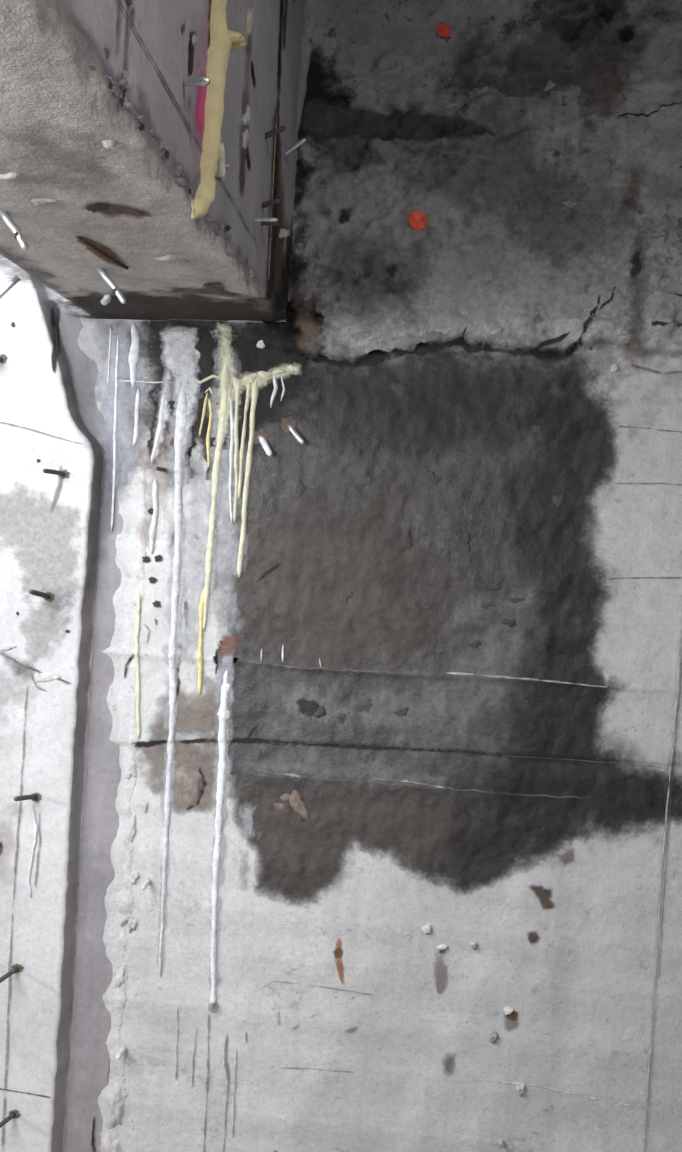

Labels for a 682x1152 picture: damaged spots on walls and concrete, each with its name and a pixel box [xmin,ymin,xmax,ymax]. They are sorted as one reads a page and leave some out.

water stain [215,6,256,194]
crack [618,102,682,118]
water stain [0,249,64,293]
crack [313,287,615,367]
crack [652,293,682,328]
crack [632,365,682,374]
water stain [51,50,682,1007]
water stain [0,476,78,666]
water stain [27,805,41,897]
corrosion [333,940,343,983]